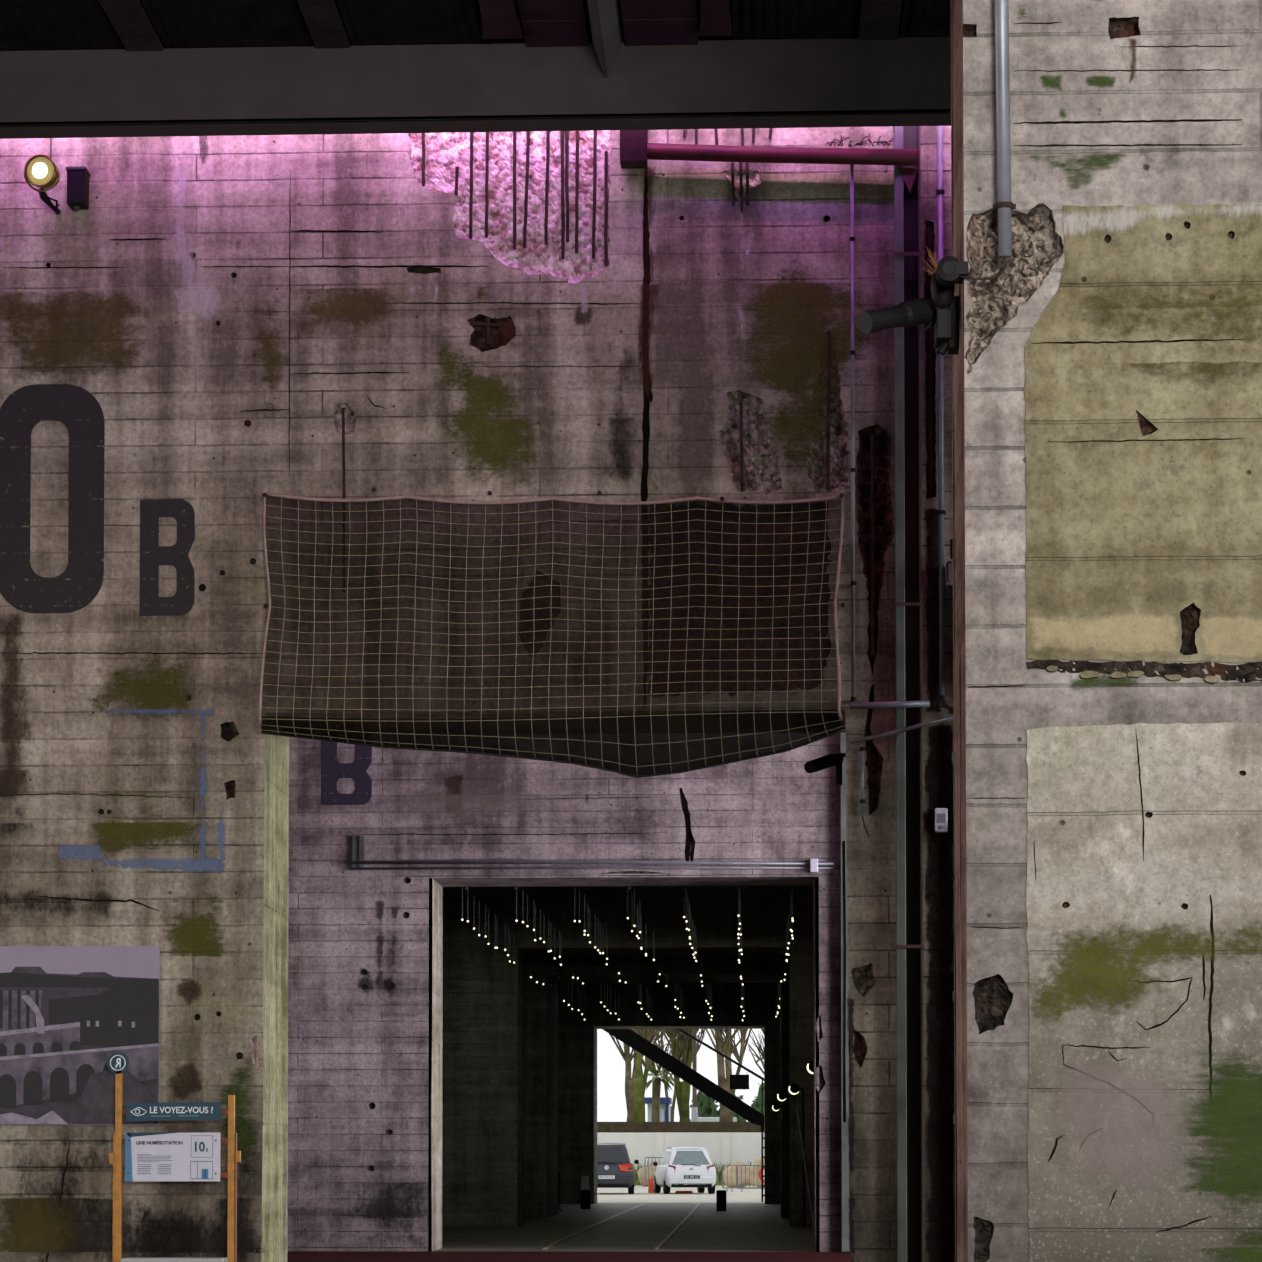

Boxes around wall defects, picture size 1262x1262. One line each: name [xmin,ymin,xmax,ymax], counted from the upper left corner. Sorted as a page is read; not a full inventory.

spalling [407,130,612,284]
crack [201,178,488,471]
spalling [467,314,516,352]
crack [386,168,653,501]
spalling [965,203,1064,374]
spalling [719,390,783,494]
spalling [798,330,894,815]
crack [361,788,695,861]
crack [1062,894,1215,1128]
crack [1048,1128,1103,1162]
crack [1157,1216,1212,1232]